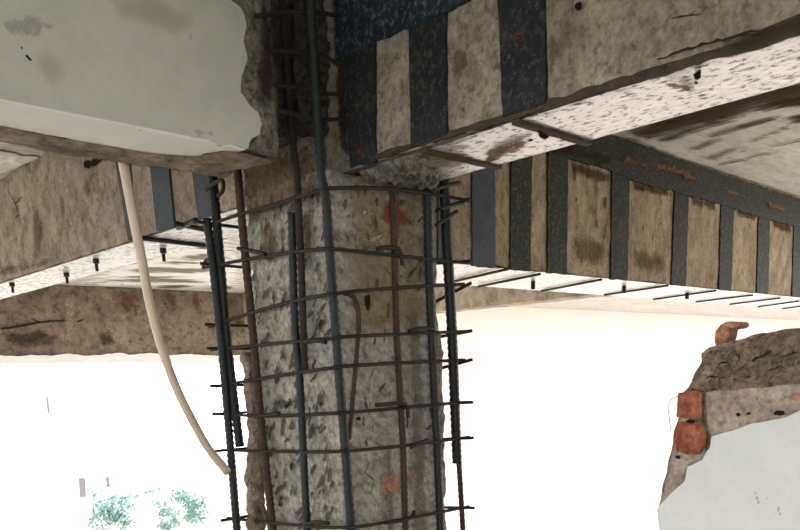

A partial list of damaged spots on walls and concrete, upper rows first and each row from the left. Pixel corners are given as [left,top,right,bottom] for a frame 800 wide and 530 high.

spalling [293,0,331,136]
spalling [358,155,441,191]
rust [484,141,528,163]
crack [1,318,84,330]
peeling [0,353,219,364]
spalling [688,329,800,393]
spalling [233,351,267,530]
spalling [435,334,447,530]
spalling [382,474,400,493]
peeling [659,442,707,506]